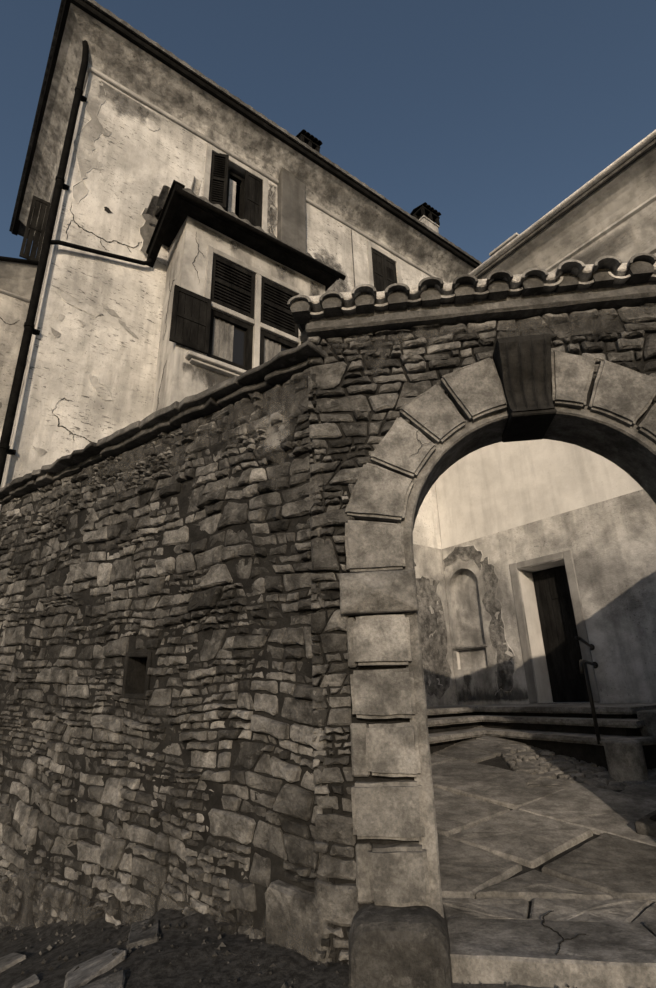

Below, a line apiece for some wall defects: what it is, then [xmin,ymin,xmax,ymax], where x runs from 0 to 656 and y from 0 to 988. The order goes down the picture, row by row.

crack [66,203,142,252]
leakage [195,222,246,249]
flaking render [315,249,350,293]
leakage [183,363,230,386]
crack [52,398,92,442]
crack [542,911,586,956]